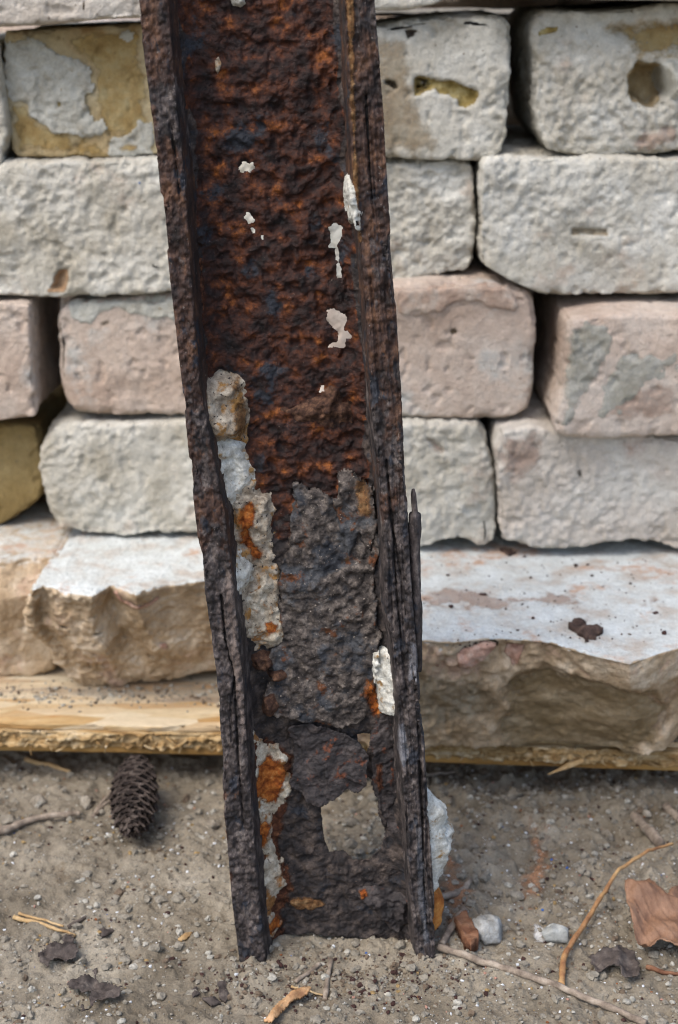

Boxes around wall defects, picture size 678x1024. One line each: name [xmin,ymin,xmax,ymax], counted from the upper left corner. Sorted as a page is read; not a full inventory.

peeling [119,29,135,42]
peeling [4,37,155,157]
corrosion [346,0,359,207]
spalling [414,76,479,108]
corrosion [232,377,248,438]
corrosion [280,385,352,428]
peeling [333,472,378,558]
corrosion [355,478,371,516]
corrosion [254,680,399,940]
corrosion [356,885,408,934]